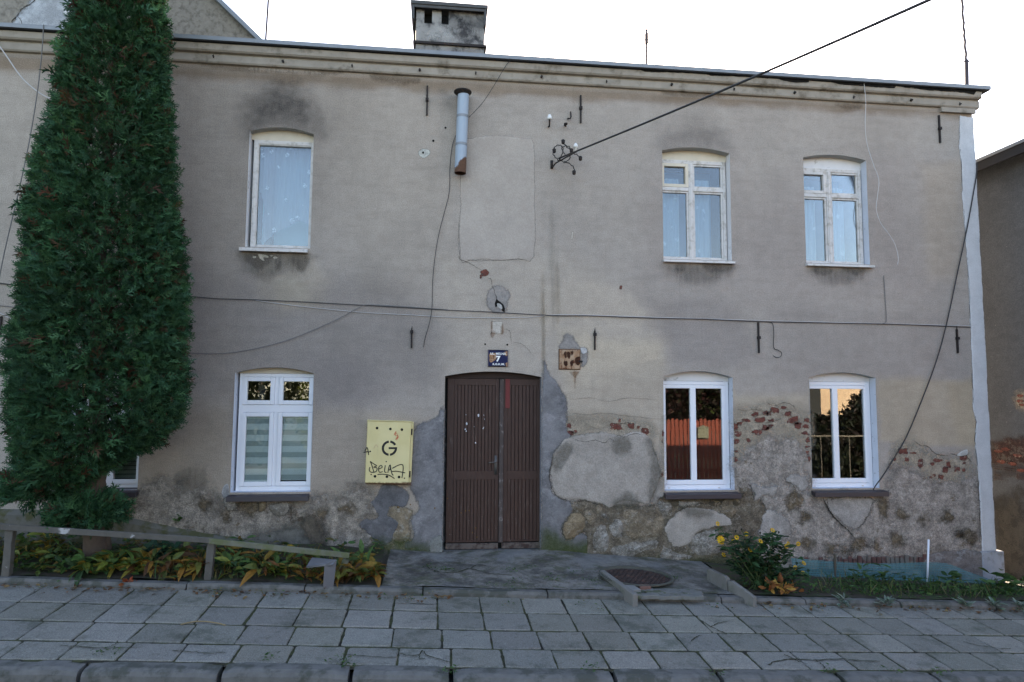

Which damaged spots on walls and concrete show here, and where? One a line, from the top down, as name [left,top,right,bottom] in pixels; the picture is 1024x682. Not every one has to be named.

peeling [130,476,413,548]
flaking render [566,414,664,443]
peeling [660,403,983,579]
flaking render [991,436,1024,480]